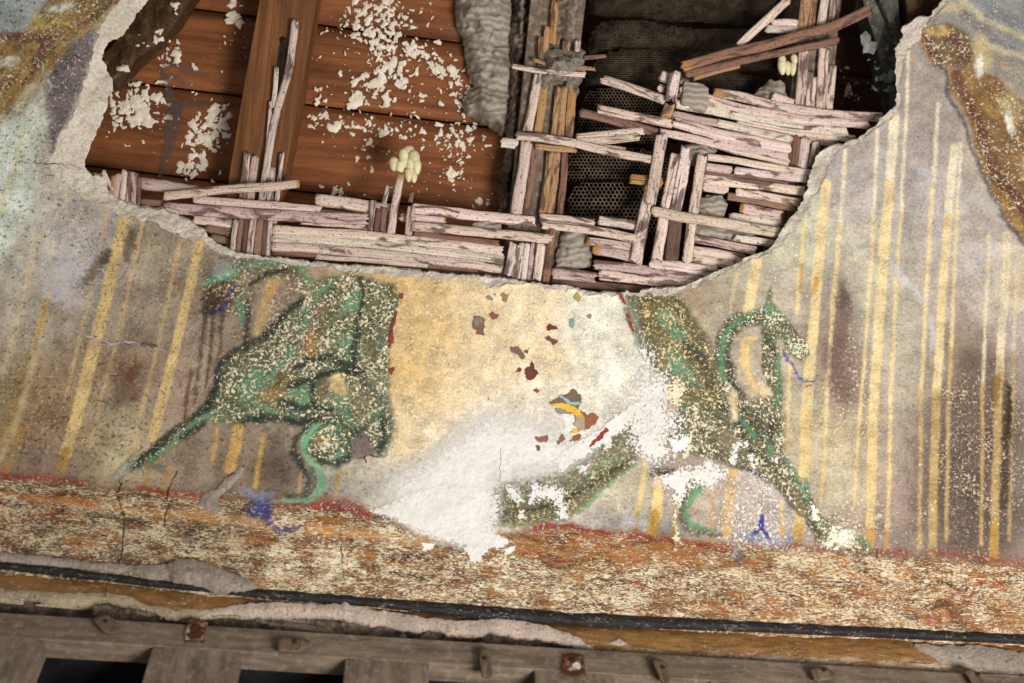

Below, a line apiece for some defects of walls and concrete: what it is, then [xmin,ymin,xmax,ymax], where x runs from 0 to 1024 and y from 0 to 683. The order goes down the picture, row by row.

peeling [47,0,949,564]
corrosion [184,623,205,643]
corrosion [560,654,585,677]
flaking render [913,643,1024,677]